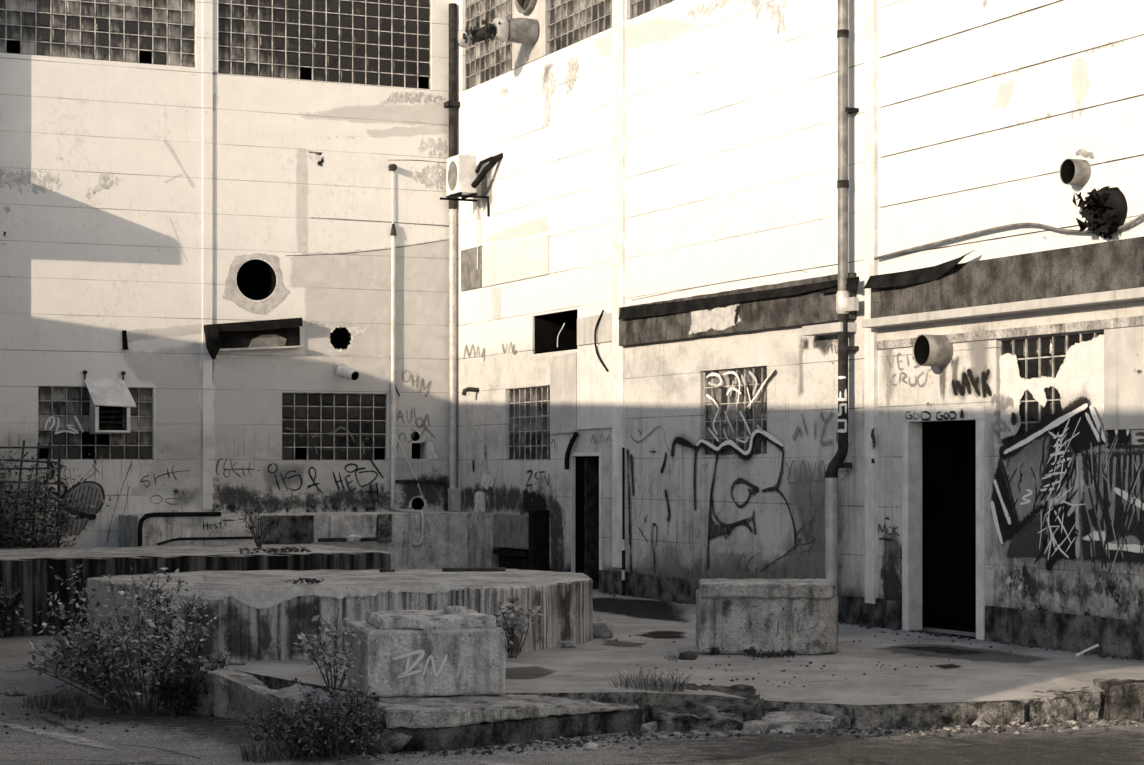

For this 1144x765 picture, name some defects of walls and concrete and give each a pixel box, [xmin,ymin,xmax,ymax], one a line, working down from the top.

peeling [684,0,787,34]
peeling [0,157,63,195]
peeling [86,172,122,200]
spalling [689,304,741,335]
peeling [999,334,1105,439]
damp [212,468,449,513]
damp [461,446,564,572]
damp [999,539,1144,621]